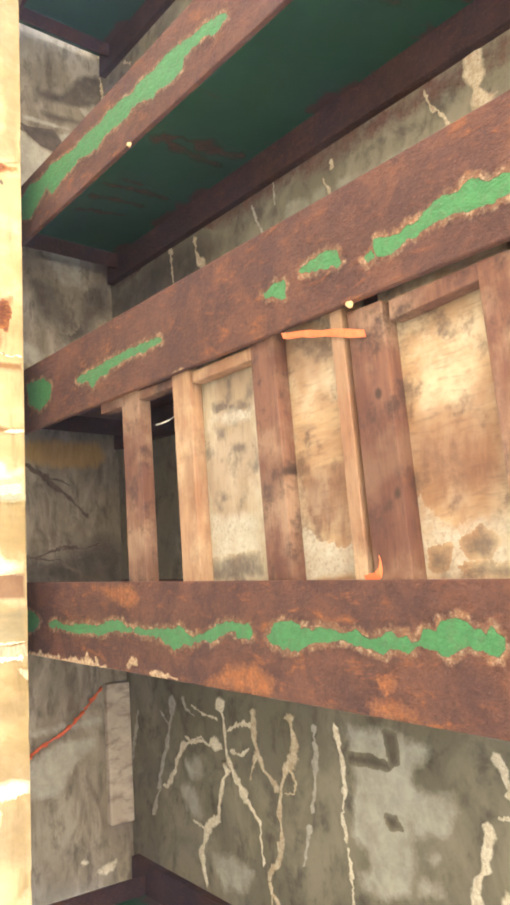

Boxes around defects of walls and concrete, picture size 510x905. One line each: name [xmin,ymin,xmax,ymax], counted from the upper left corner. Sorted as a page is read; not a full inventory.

leakage [461,47,499,112]
peeling [20,6,231,224]
corrosion [204,29,510,233]
peeling [258,161,510,307]
corrosion [0,293,15,349]
peeling [25,374,71,428]
leakage [409,402,510,579]
peeling [0,604,510,668]
corrosion [199,659,278,698]
corrosion [363,669,421,723]
leakage [346,728,400,772]
leakage [470,816,510,905]